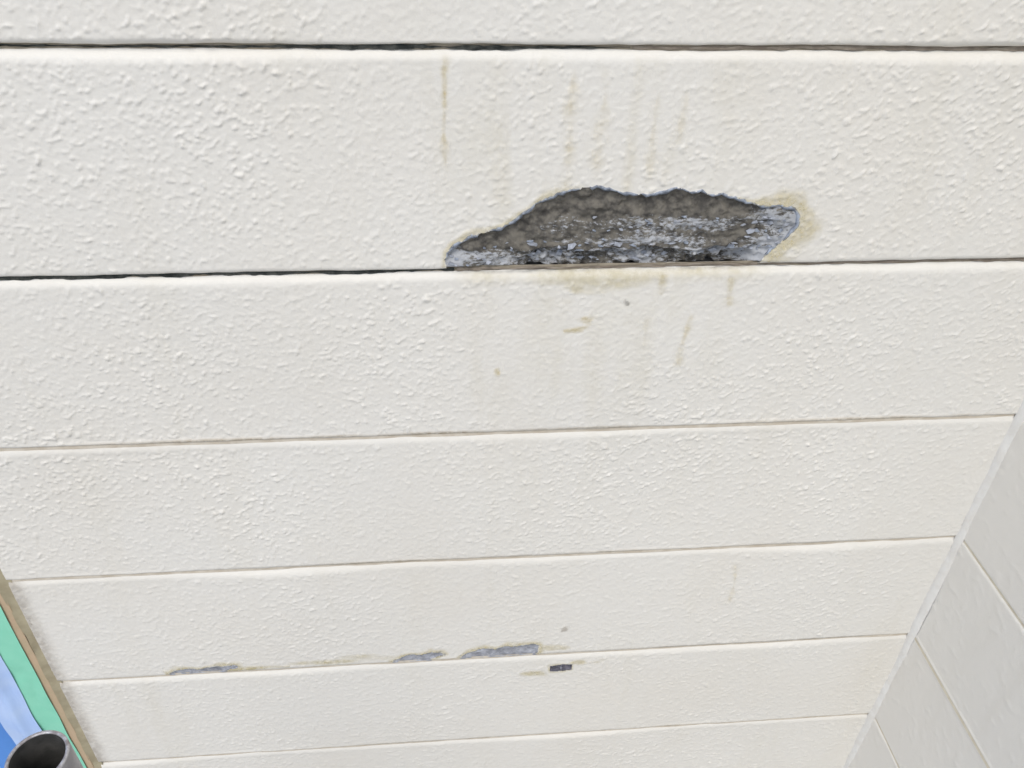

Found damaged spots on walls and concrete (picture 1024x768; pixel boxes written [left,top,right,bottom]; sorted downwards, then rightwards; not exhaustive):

spalling [444,185,800,267]
peeling [393,651,446,663]
peeling [460,643,539,659]
peeling [169,665,239,675]